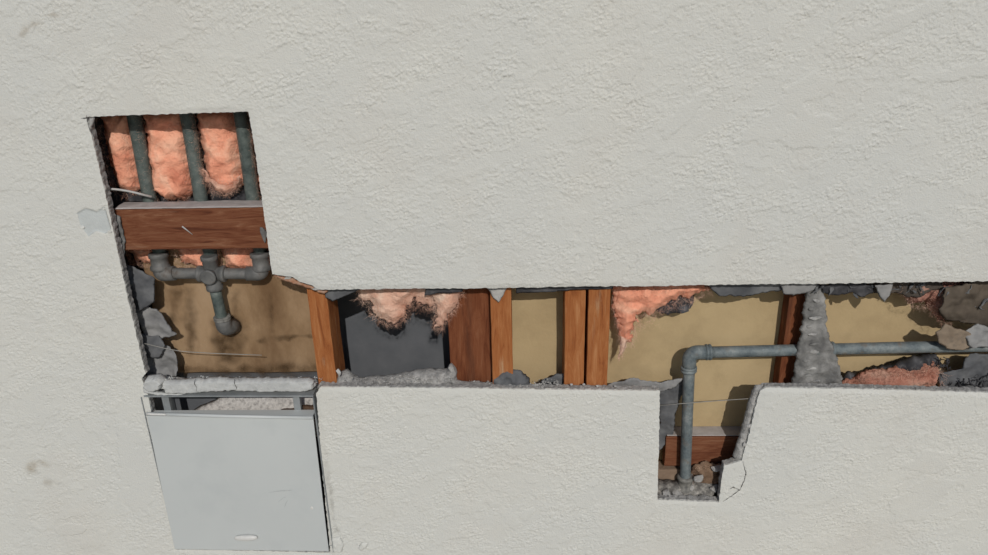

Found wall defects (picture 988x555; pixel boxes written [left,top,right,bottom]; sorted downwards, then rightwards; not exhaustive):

spalling [77,115,182,412]
spalling [487,288,507,302]
spalling [317,363,660,392]
spalling [657,383,988,502]